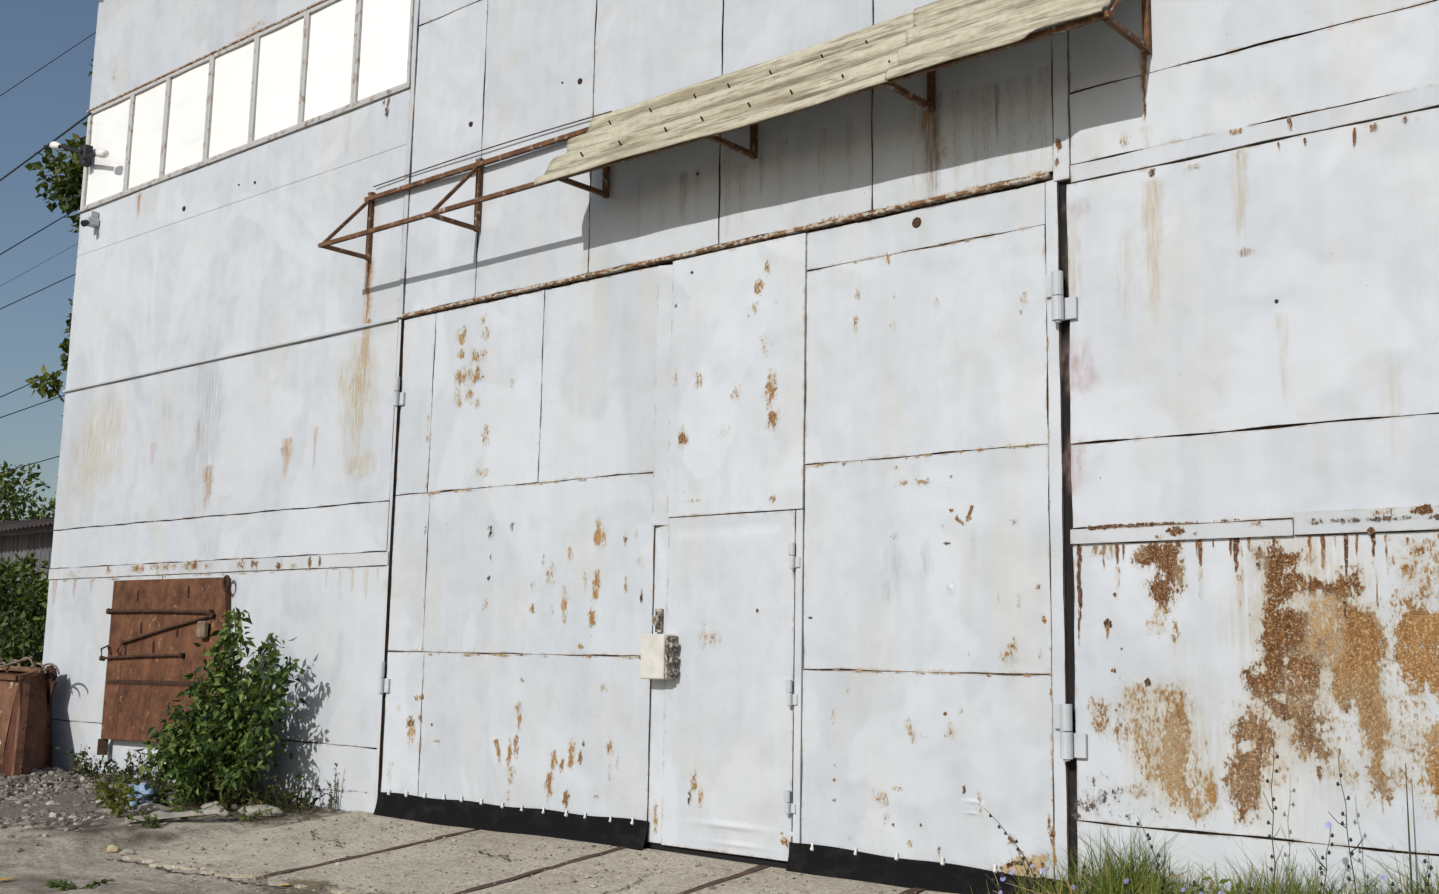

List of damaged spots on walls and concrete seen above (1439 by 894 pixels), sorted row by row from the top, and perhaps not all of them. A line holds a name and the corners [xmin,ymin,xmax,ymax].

rust [748,259,777,317]
rust [454,315,489,406]
rust [761,334,778,431]
rust [93,556,351,581]
rust [529,547,574,624]
rust [583,570,601,627]
rust [593,521,637,546]
rust [1075,504,1439,827]
rust [493,703,521,801]
rust [544,738,585,808]